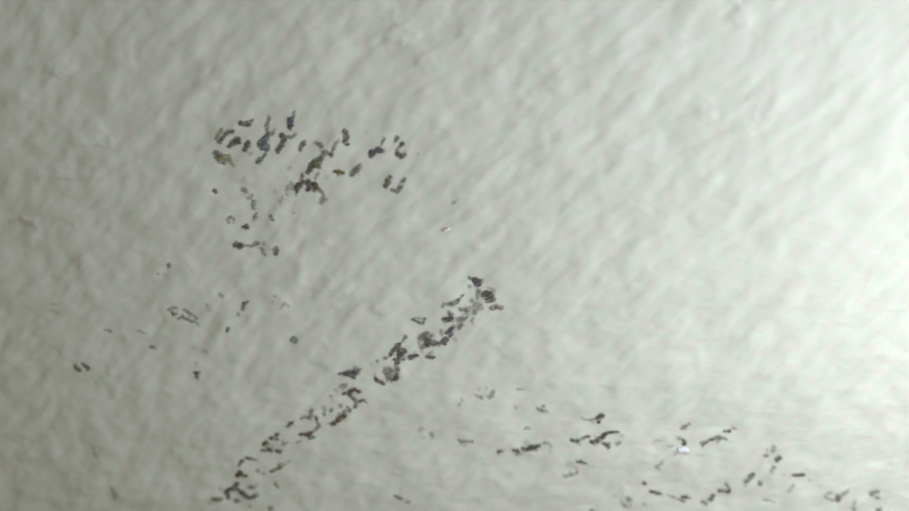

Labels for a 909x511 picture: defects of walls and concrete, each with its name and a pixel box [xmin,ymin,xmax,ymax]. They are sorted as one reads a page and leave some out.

water stain [339,371,365,403]
water stain [595,431,619,449]